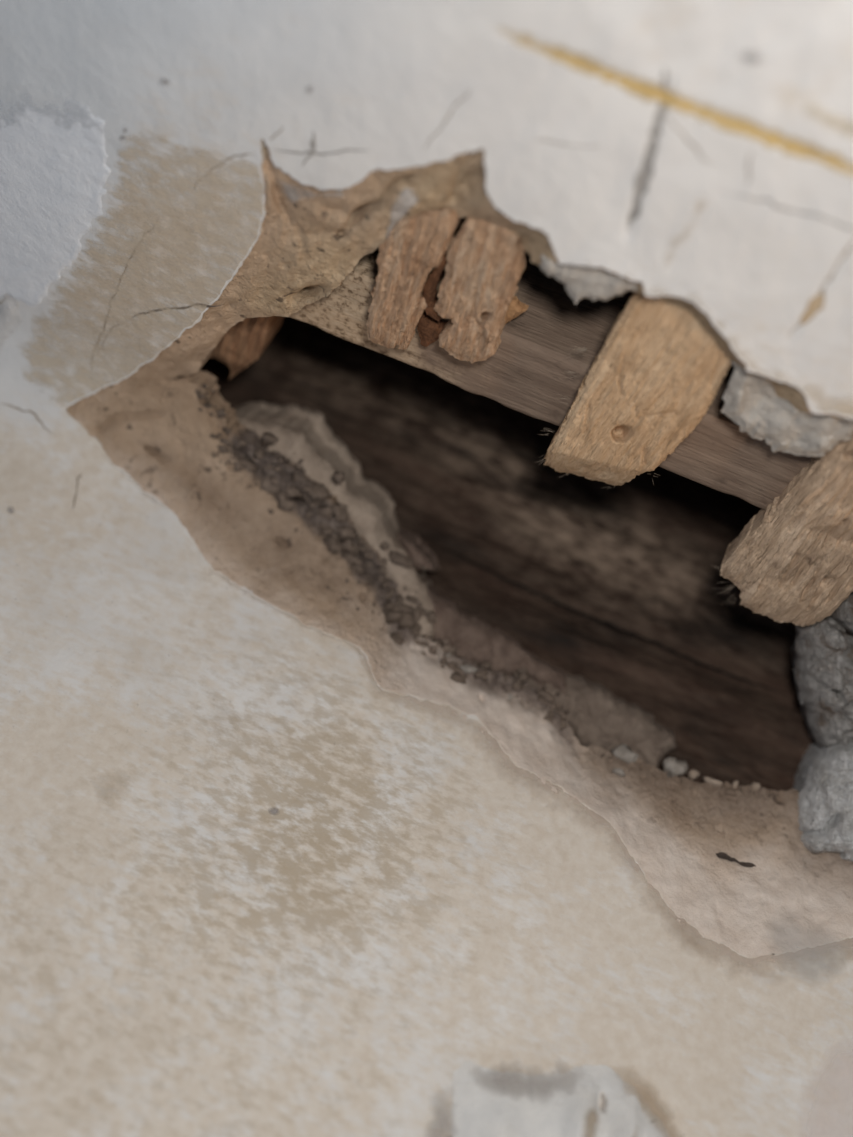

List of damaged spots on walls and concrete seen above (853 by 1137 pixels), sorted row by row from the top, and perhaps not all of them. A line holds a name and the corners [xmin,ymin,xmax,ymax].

flaking render [66,144,853,962]